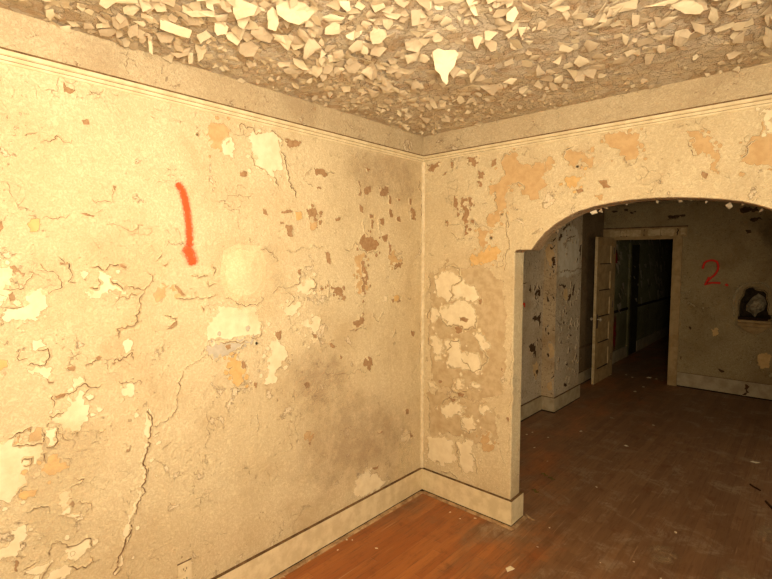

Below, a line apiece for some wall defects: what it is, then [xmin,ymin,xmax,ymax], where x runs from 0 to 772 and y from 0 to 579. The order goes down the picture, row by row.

peeling [42,0,772,137]
peeling [194,115,302,198]
peeling [304,167,335,190]
peeling [610,214,686,237]
peeling [685,128,724,180]
peeling [725,202,772,234]
peeling [736,107,772,178]
peeling [272,180,416,360]
peeling [424,127,649,479]
peeling [0,254,292,579]
crack [110,354,206,577]
peeling [350,462,391,499]